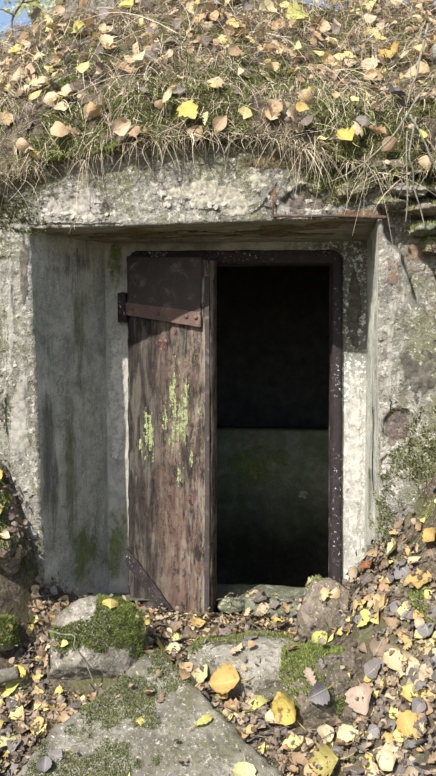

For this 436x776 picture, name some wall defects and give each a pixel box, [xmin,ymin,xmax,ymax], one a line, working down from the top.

corrosion [270,186,387,227]
water stain [44,408,58,522]